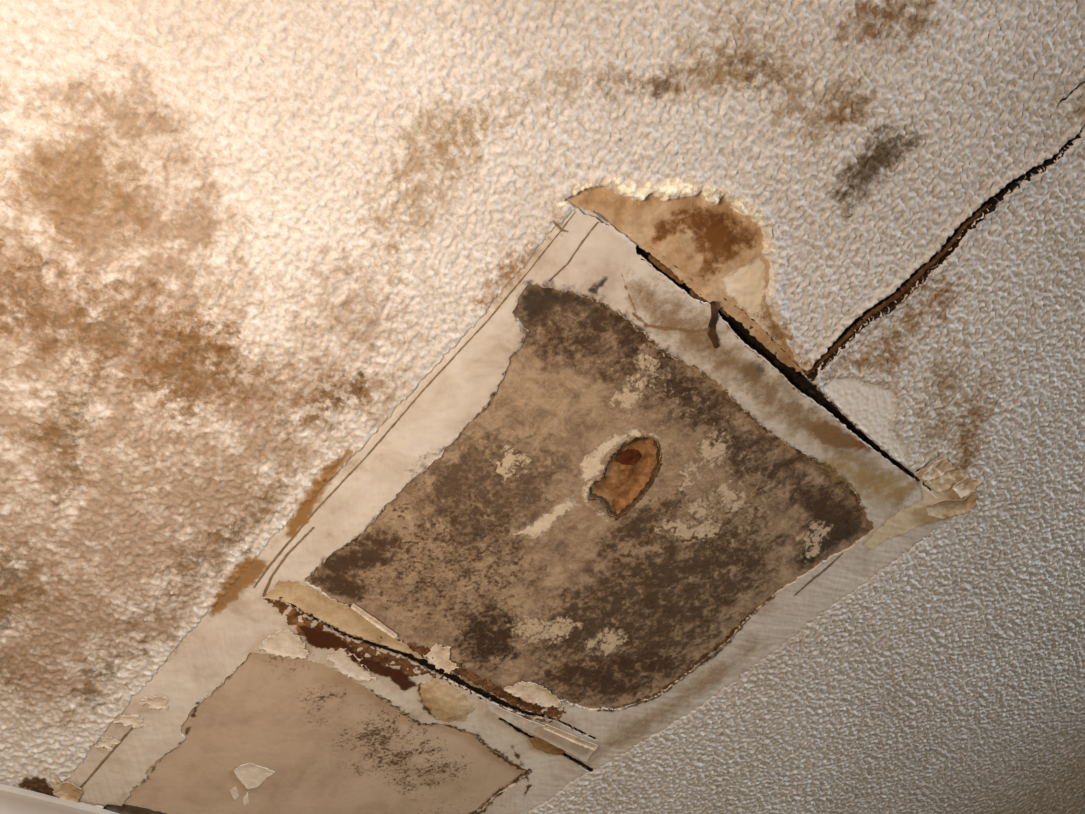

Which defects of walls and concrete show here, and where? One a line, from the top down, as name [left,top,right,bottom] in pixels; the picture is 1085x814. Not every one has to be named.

damp [0,552,49,629]
damp [26,392,85,485]
damp [0,259,254,419]
damp [162,483,281,587]
crack [253,210,608,596]
damp [310,278,916,705]
peeling [305,284,981,709]
peeling [556,176,805,375]
crack [634,125,1085,490]
peeling [113,696,169,729]
peeling [123,629,529,814]
crack [291,604,596,772]